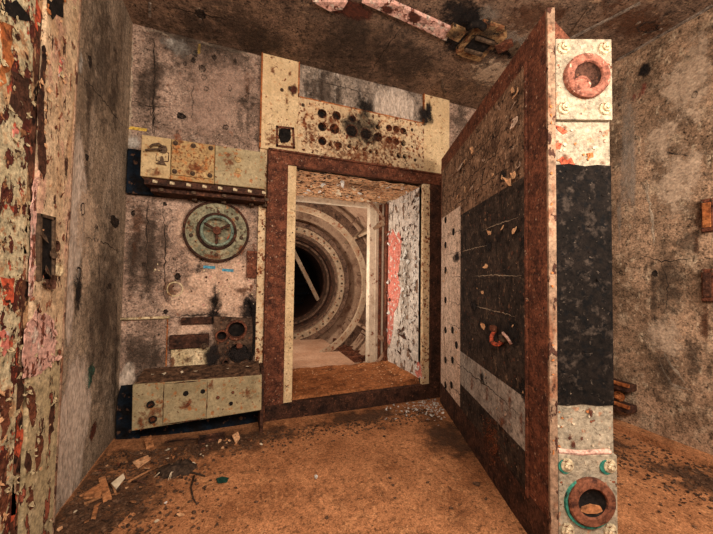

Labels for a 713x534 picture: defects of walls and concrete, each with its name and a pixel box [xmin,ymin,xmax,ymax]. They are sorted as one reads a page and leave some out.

peeling [0,0,92,308]
crack [78,7,258,148]
rust [259,52,275,149]
rust [271,121,295,149]
rust [286,62,425,124]
damp [360,88,414,120]
peeling [302,176,429,379]
peeling [0,308,62,524]